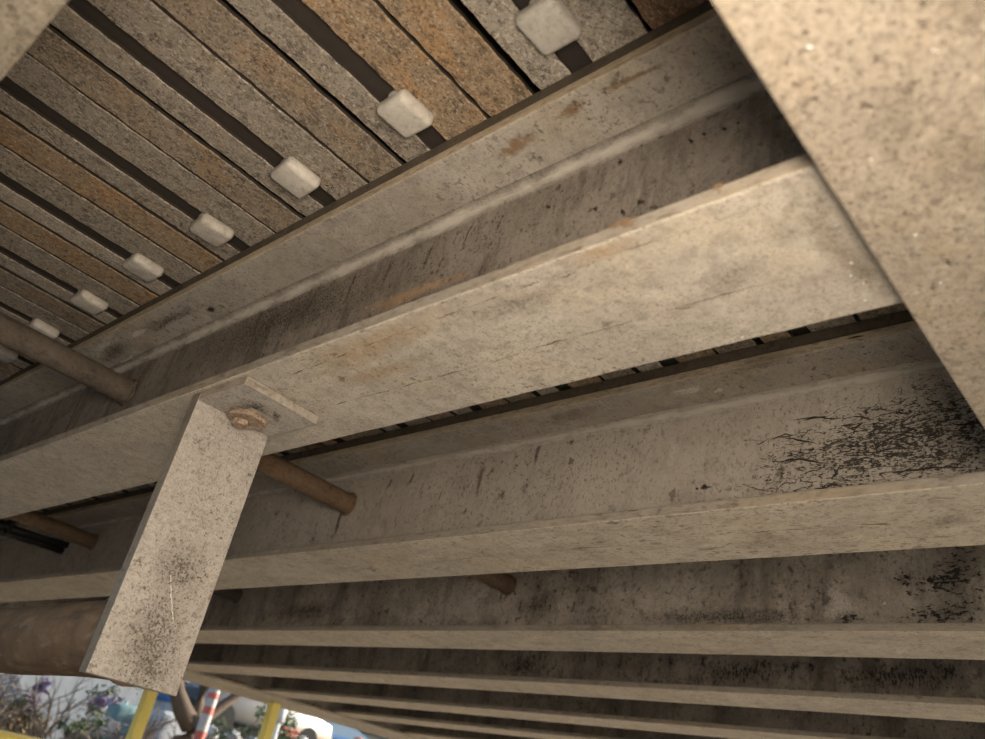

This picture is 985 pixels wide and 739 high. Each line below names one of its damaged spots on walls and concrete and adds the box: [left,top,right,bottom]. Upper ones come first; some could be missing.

damp [894,547,984,623]